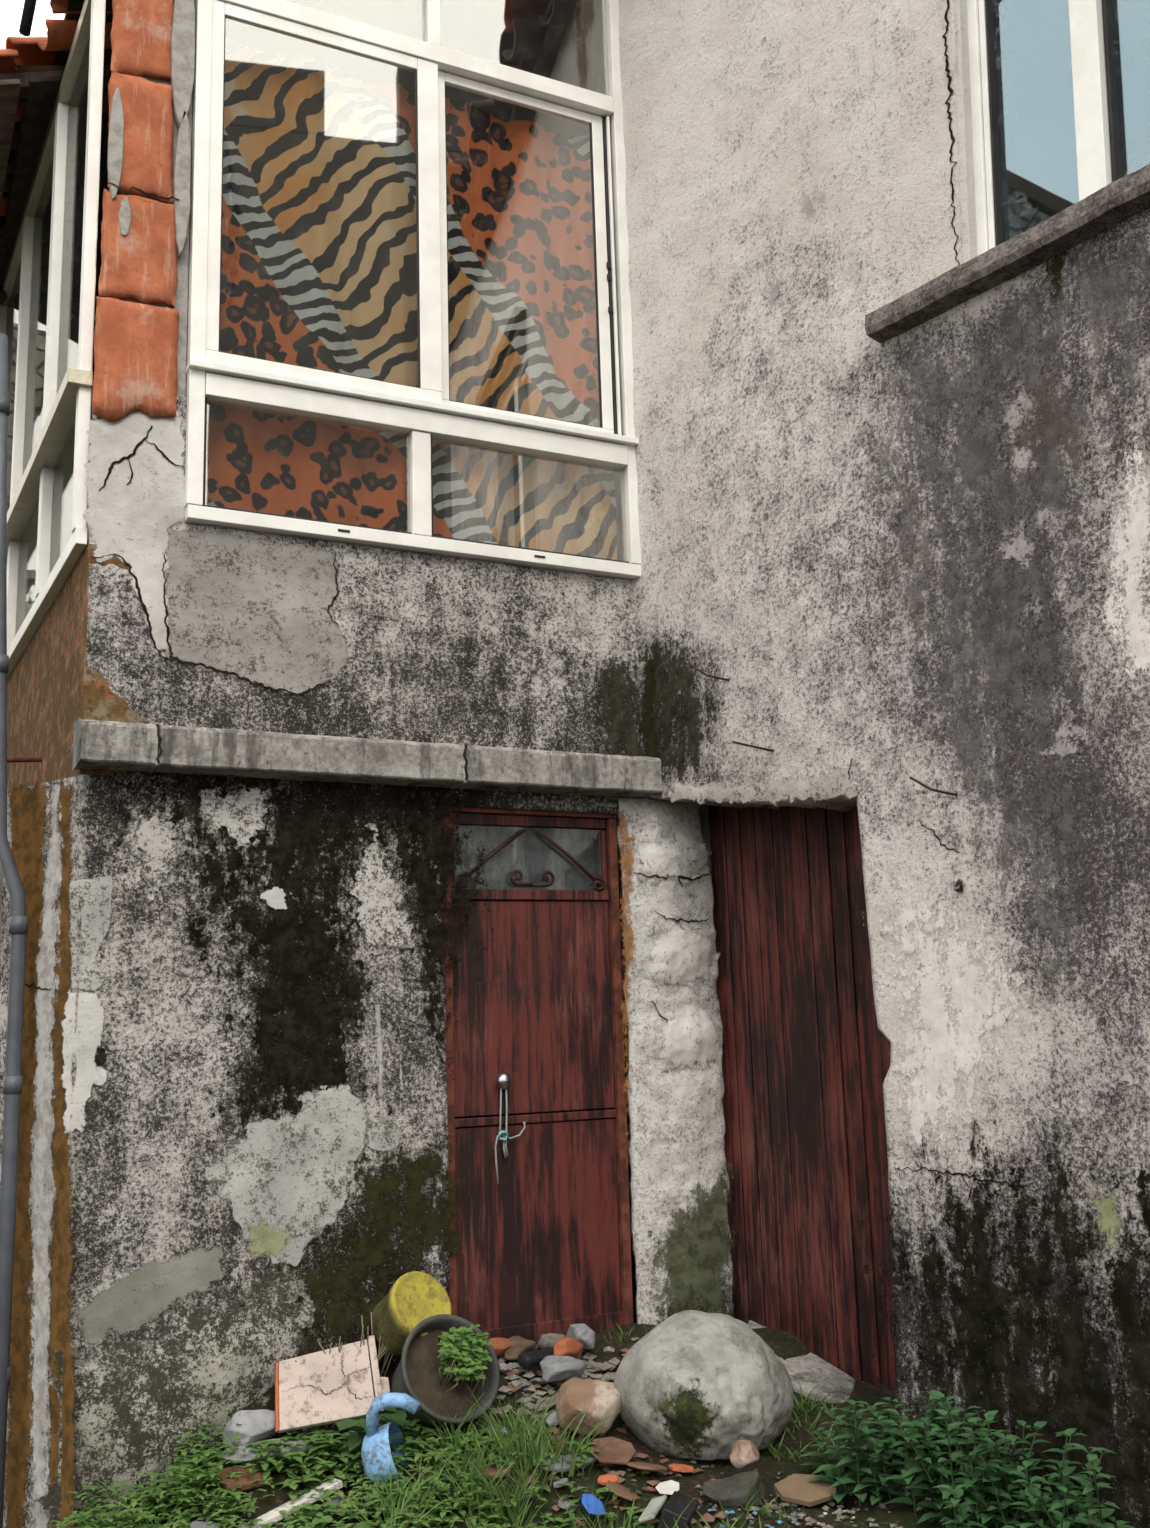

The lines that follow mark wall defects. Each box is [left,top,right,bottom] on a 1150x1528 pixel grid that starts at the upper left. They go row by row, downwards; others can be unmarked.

crack [942,0,960,266]
crack [98,426,184,491]
peeling [82,410,348,696]
water stain [582,633,722,793]
water stain [849,211,1150,998]
peeling [61,875,114,1133]
peeling [123,797,181,901]
water stain [98,770,500,1146]
rust [3,779,78,1528]
spalling [205,1084,401,1267]
water stain [843,1103,1150,1528]